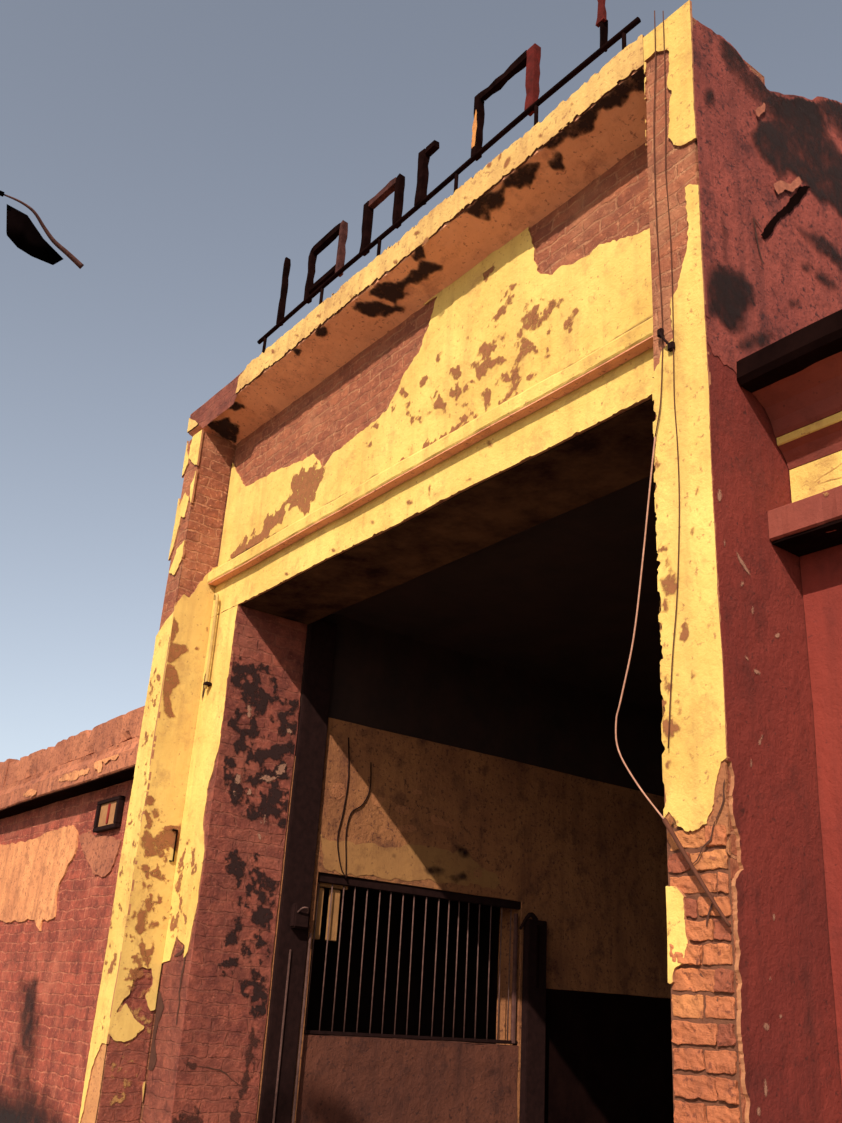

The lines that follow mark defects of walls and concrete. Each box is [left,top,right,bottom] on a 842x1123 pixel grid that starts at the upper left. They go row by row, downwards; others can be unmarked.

spalling [530,51,697,371]
leakage [708,265,753,330]
leakage [724,40,842,215]
leakage [808,234,842,266]
spalling [148,283,579,719]
spalling [658,546,677,611]
spalling [662,677,680,737]
spalling [679,622,689,641]
peeling [0,656,299,1123]
spalling [664,761,742,1123]